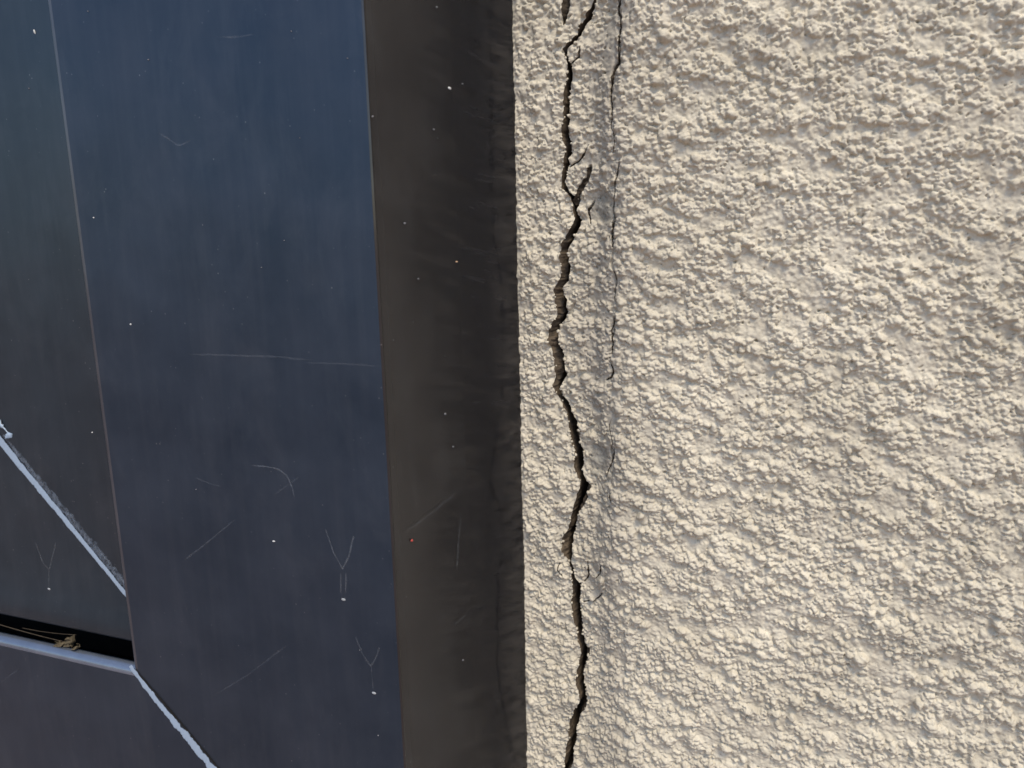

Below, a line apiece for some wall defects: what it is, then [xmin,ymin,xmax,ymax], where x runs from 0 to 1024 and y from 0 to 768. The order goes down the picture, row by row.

crack [546,0,622,768]